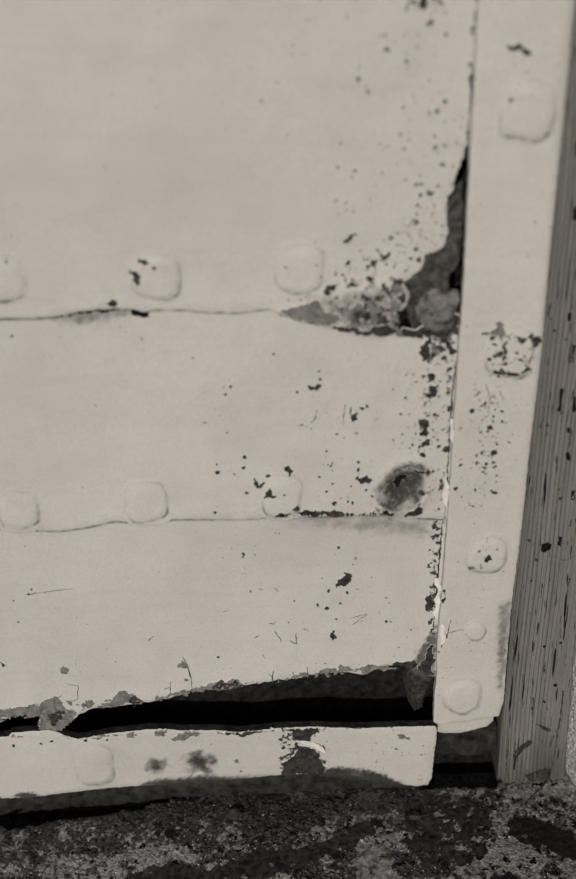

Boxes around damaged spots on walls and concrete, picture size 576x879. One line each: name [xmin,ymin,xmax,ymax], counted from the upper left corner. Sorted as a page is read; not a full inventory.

peeling [417,0,434,27]
peeling [280,251,408,337]
corrosion [468,320,543,507]
corrosion [329,179,465,711]
corrosion [275,509,374,518]
peeling [285,659,418,681]
peeling [0,665,111,745]
corrosion [60,699,136,711]
peeling [101,690,145,707]
peeling [165,678,259,699]
peeling [154,728,203,742]
peeling [216,726,326,776]